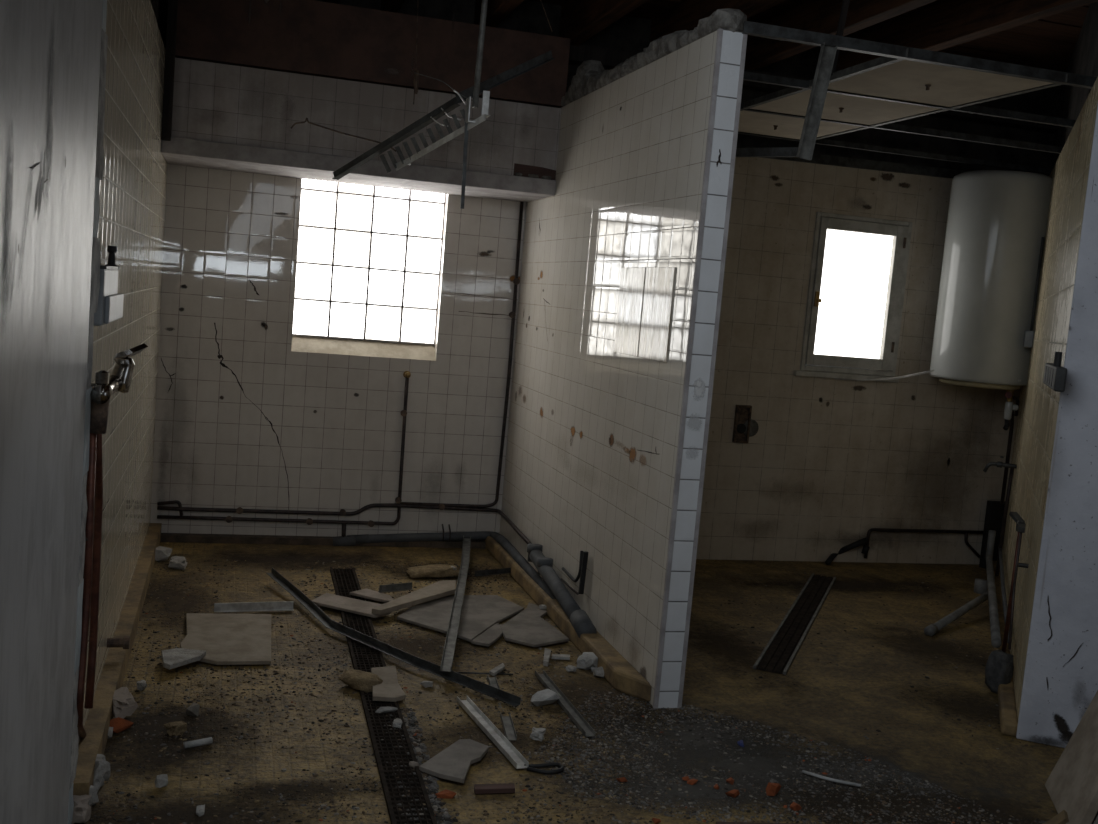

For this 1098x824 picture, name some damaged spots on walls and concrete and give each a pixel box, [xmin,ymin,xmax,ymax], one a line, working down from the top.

spalling [561,8,747,106]
crack [214,323,289,525]
corrosion [609,434,636,462]